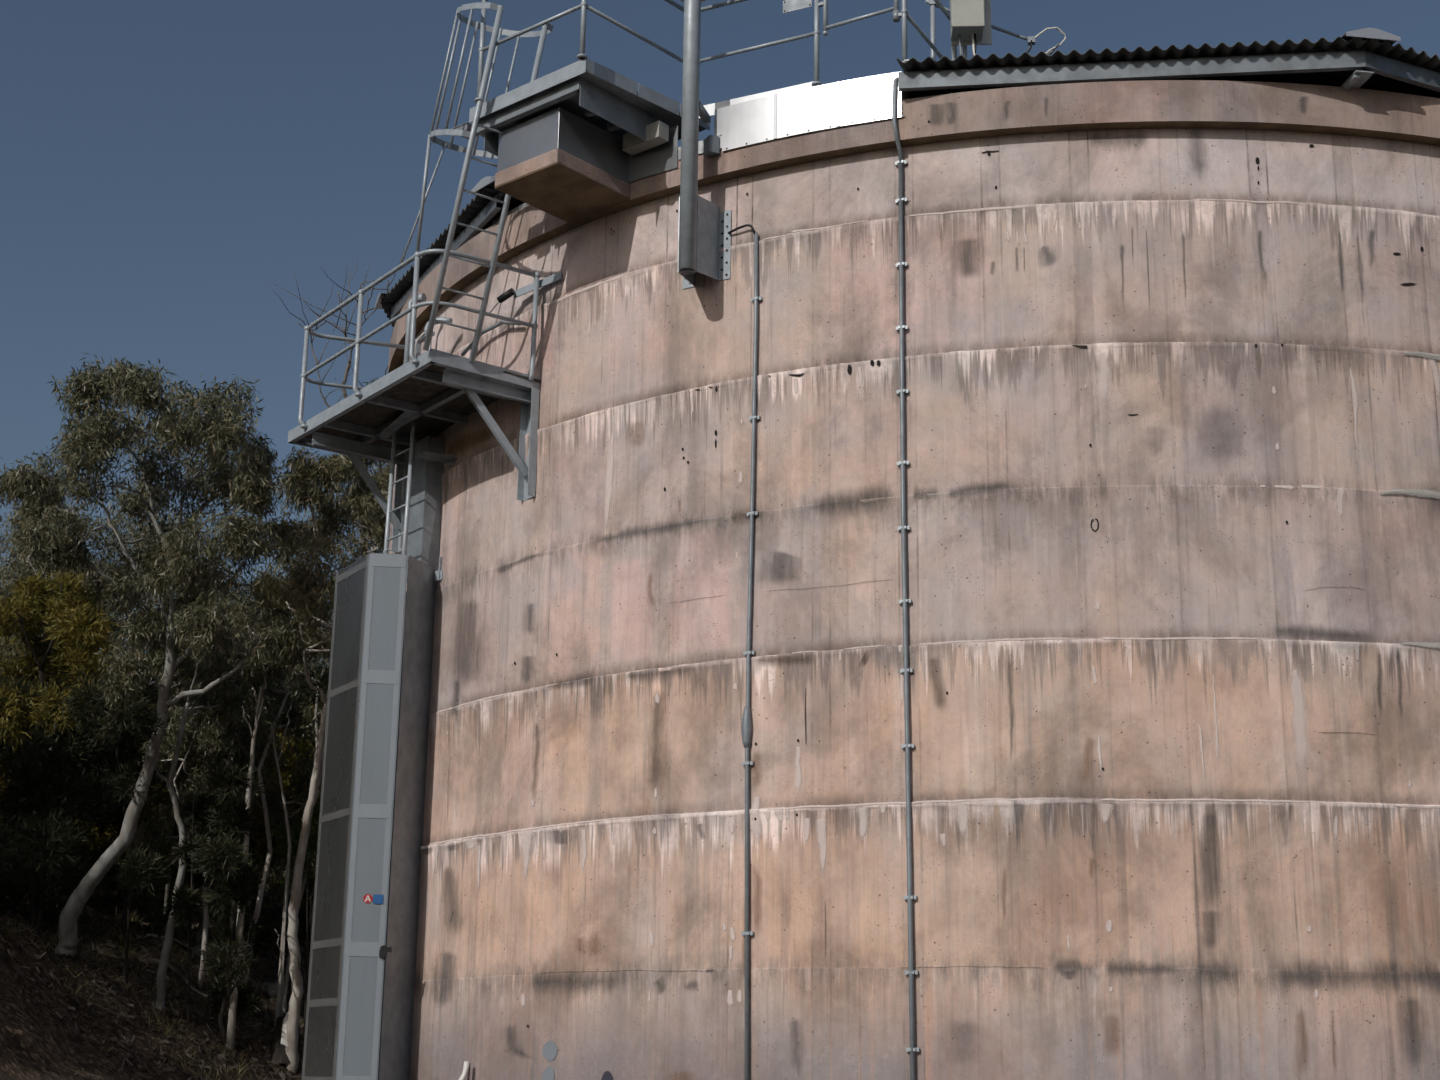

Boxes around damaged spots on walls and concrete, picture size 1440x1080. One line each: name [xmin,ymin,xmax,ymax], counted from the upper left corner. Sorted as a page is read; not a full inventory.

damp [909,207,1020,216]
damp [545,268,645,334]
damp [1085,353,1109,398]
damp [1350,369,1358,444]
damp [605,416,615,524]
damp [431,693,511,720]
damp [1292,670,1307,765]
damp [751,746,1070,869]
damp [1099,798,1312,822]
damp [428,815,658,886]